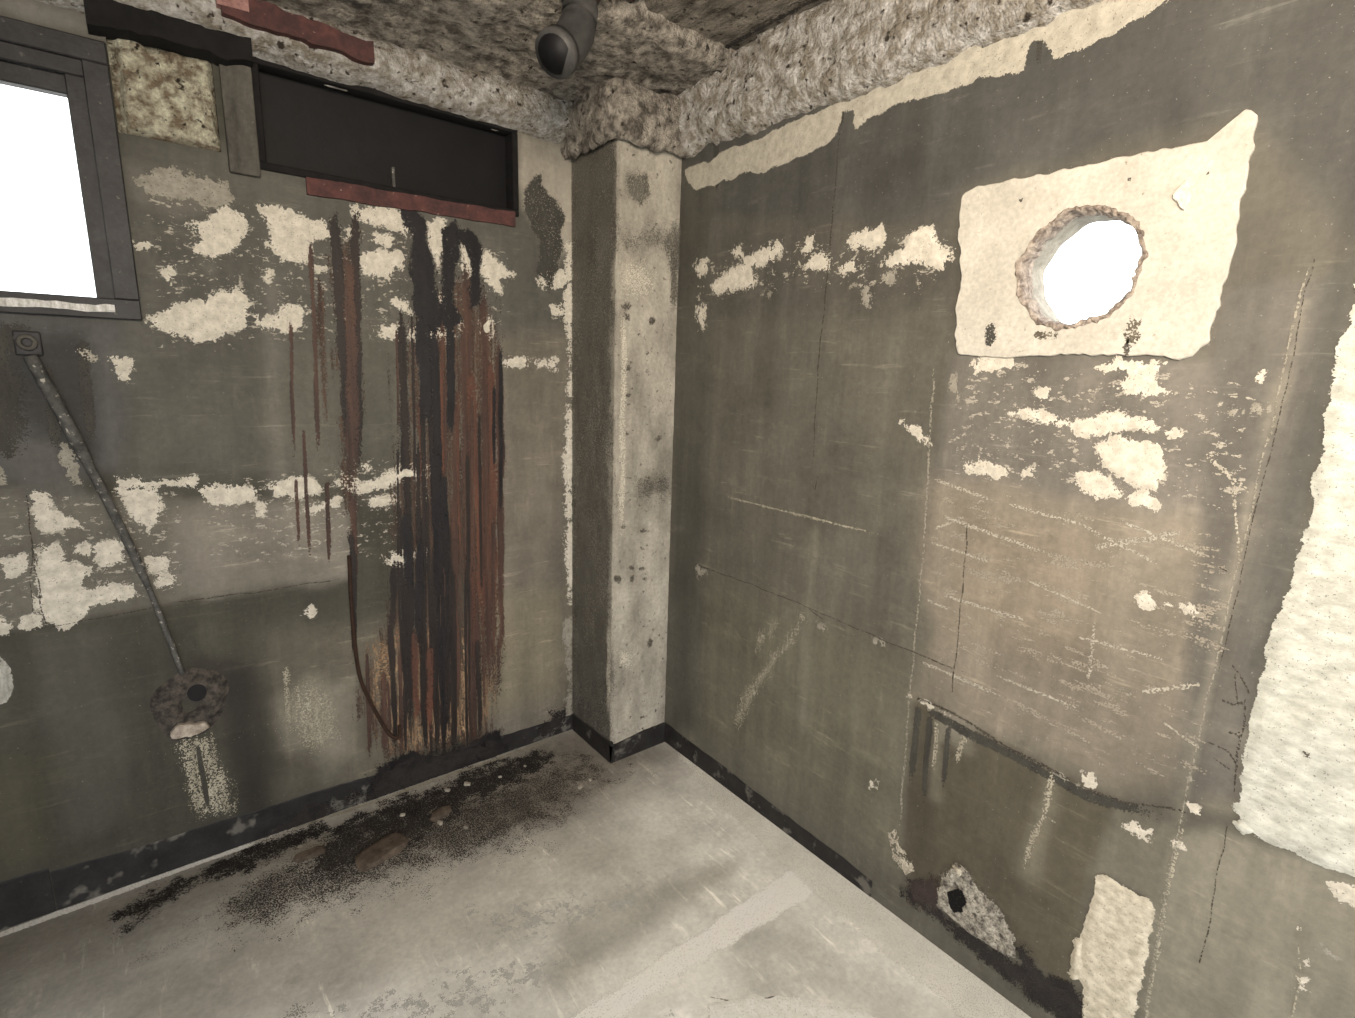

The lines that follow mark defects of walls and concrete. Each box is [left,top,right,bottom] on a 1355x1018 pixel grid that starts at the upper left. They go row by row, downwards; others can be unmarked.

peeling [685,0,1169,191]
peeling [132,165,517,352]
peeling [692,222,956,332]
peeling [107,355,137,384]
peeling [0,442,430,636]
rust [288,210,510,764]
peeling [898,419,933,446]
peeling [947,355,1272,513]
flaking render [1232,304,1355,909]
damp [174,733,239,821]
damp [280,735,560,835]
flaking render [1067,874,1156,1018]